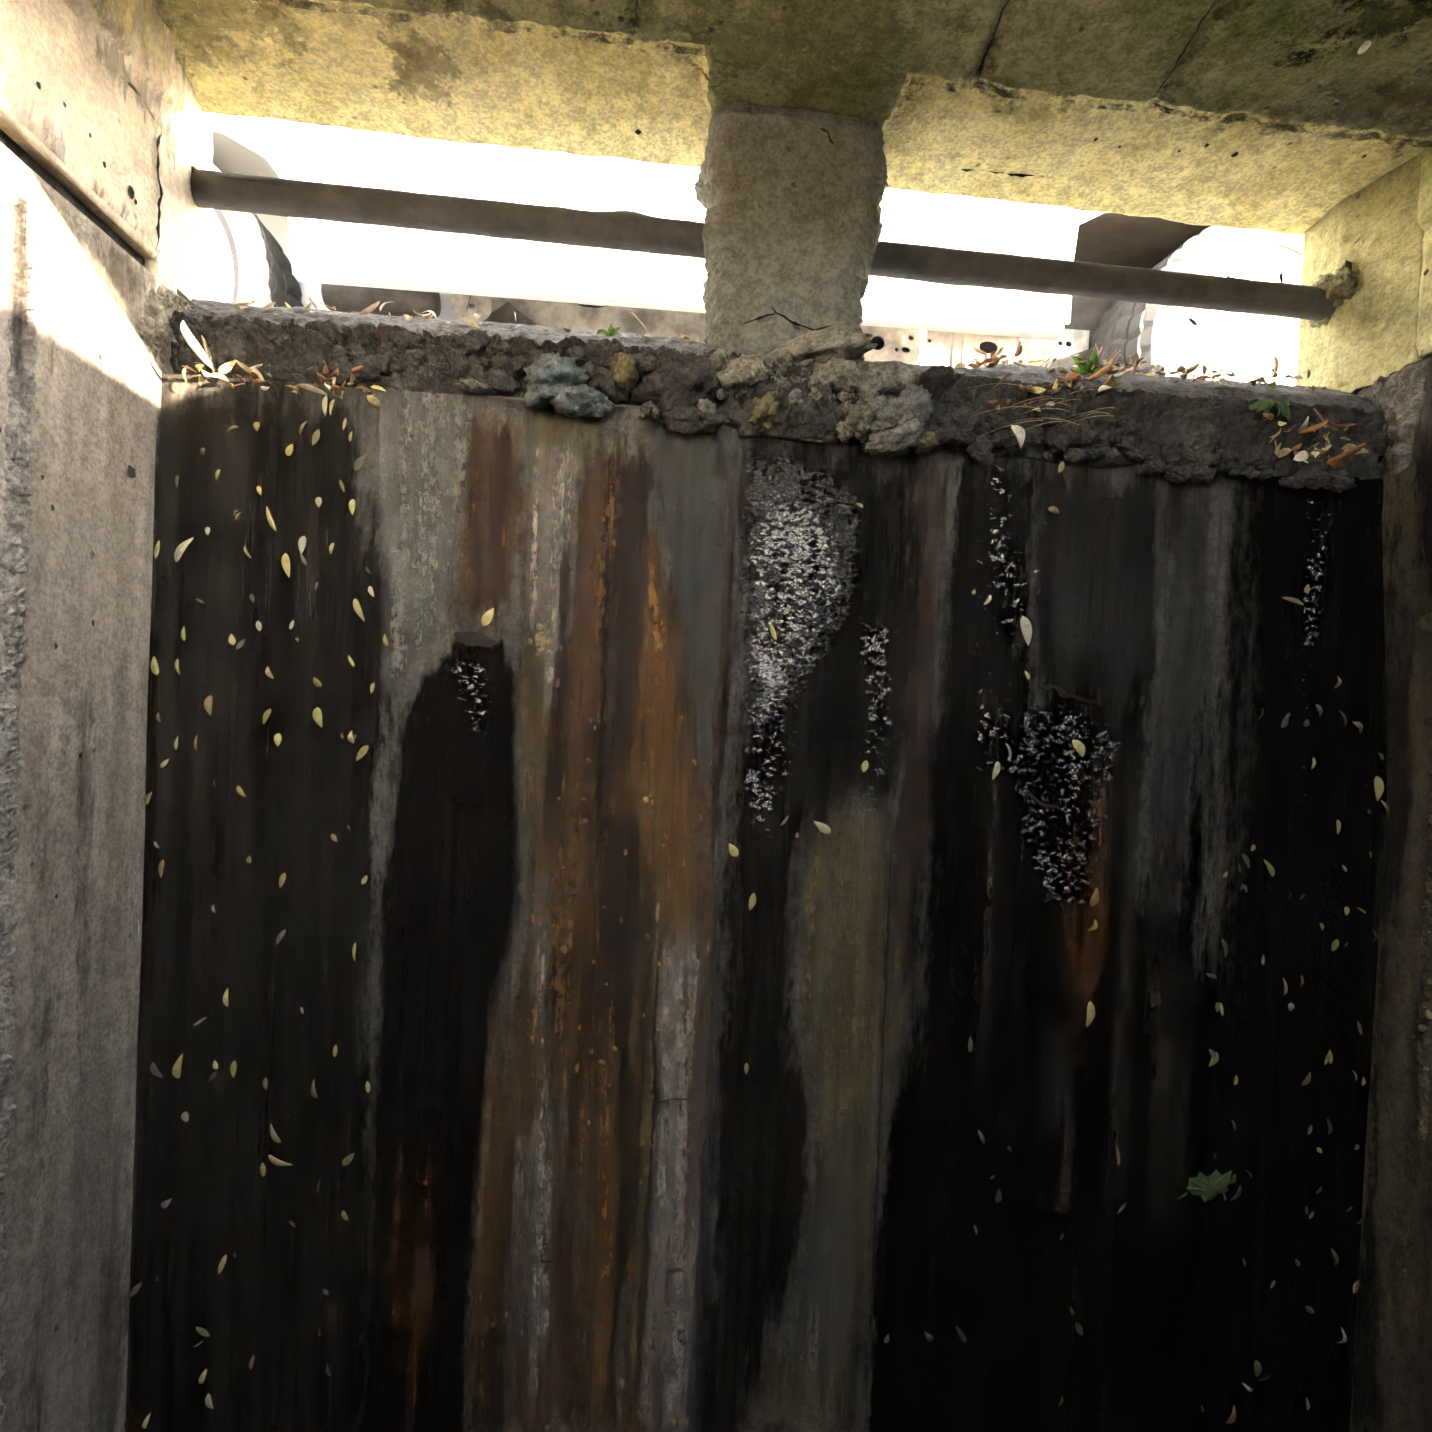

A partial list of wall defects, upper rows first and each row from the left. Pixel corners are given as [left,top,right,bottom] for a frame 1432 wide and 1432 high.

leakage [102,379,577,1432]
rust [391,1132,441,1395]
rust [455,431,735,1432]
crack [976,0,1010,80]
leakage [593,436,1415,1432]
leakage [1415,358,1432,596]